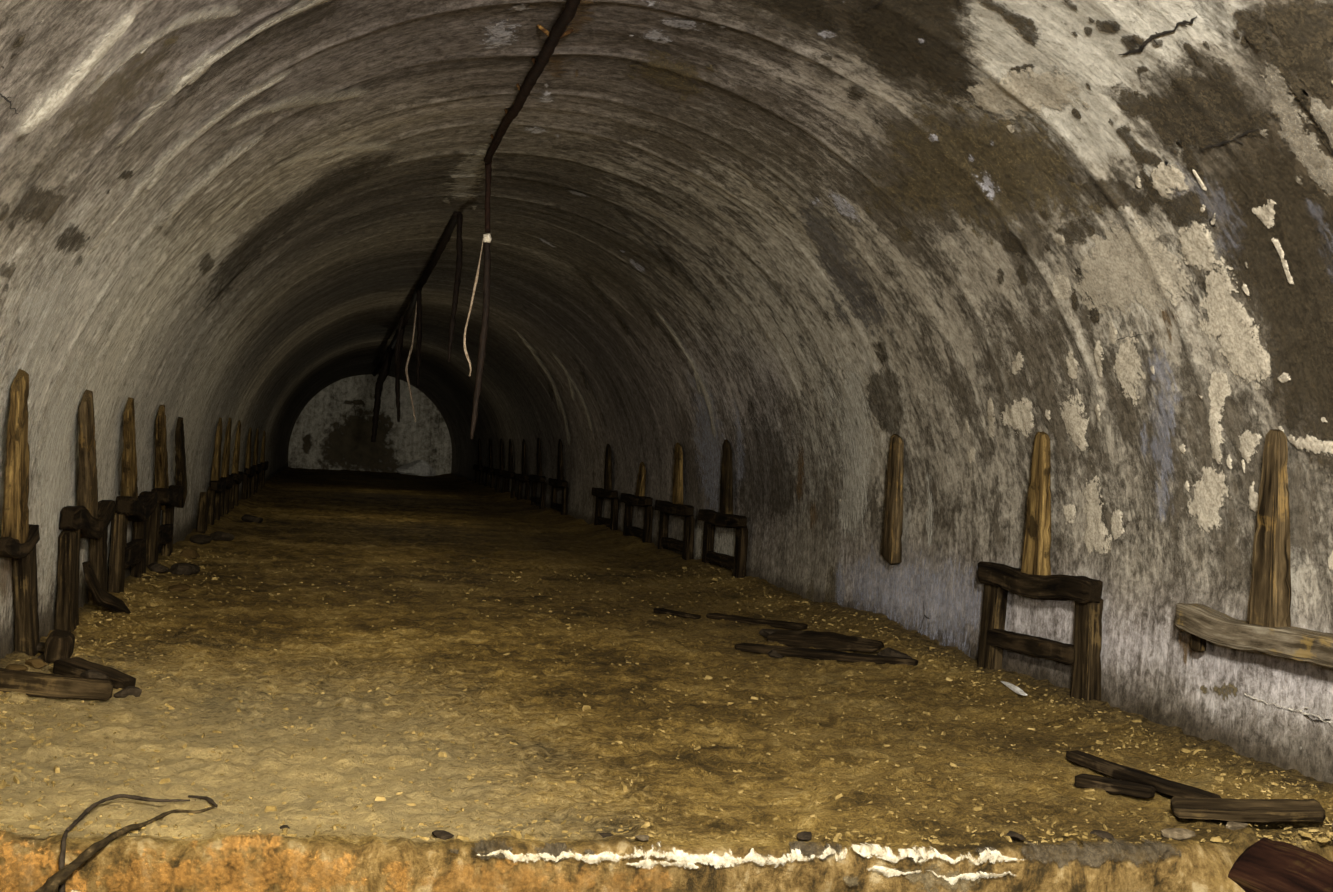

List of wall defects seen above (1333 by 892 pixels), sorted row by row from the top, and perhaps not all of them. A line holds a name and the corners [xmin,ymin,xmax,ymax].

spalling [978,0,1041,45]
spalling [1065,0,1163,50]
crack [1119,16,1197,56]
peeling [966,64,1091,133]
leakage [0,184,66,231]
spalling [997,230,1028,285]
peeling [1040,41,1294,534]
leakage [1195,141,1333,484]
leakage [0,224,98,609]
peeling [986,349,1101,451]
peeling [1278,426,1333,457]
peeling [1063,475,1125,557]